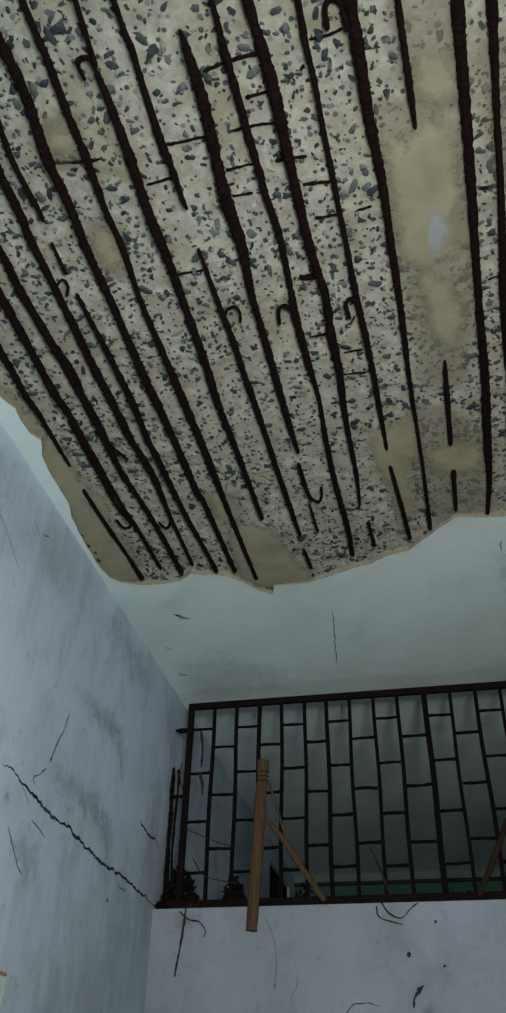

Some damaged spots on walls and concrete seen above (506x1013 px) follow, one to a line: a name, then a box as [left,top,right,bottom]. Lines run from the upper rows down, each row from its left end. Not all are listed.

spalling [0,0,506,594]
crack [3,715,154,905]